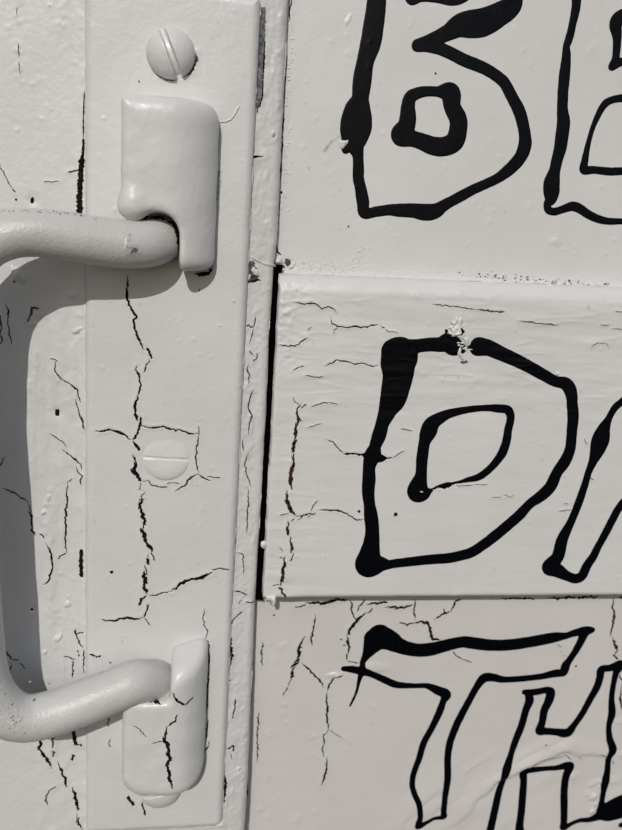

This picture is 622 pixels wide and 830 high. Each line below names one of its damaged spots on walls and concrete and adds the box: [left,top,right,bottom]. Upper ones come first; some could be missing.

crack [294,359,378,378]
crack [296,302,399,334]
peeling [448,316,474,364]
crack [432,304,504,313]
crack [50,277,258,625]
crack [3,433,83,585]
crack [272,398,471,784]
crack [134,609,235,789]
crack [232,642,264,759]
crack [610,599,622,709]
crack [37,737,83,830]
crack [127,795,146,816]